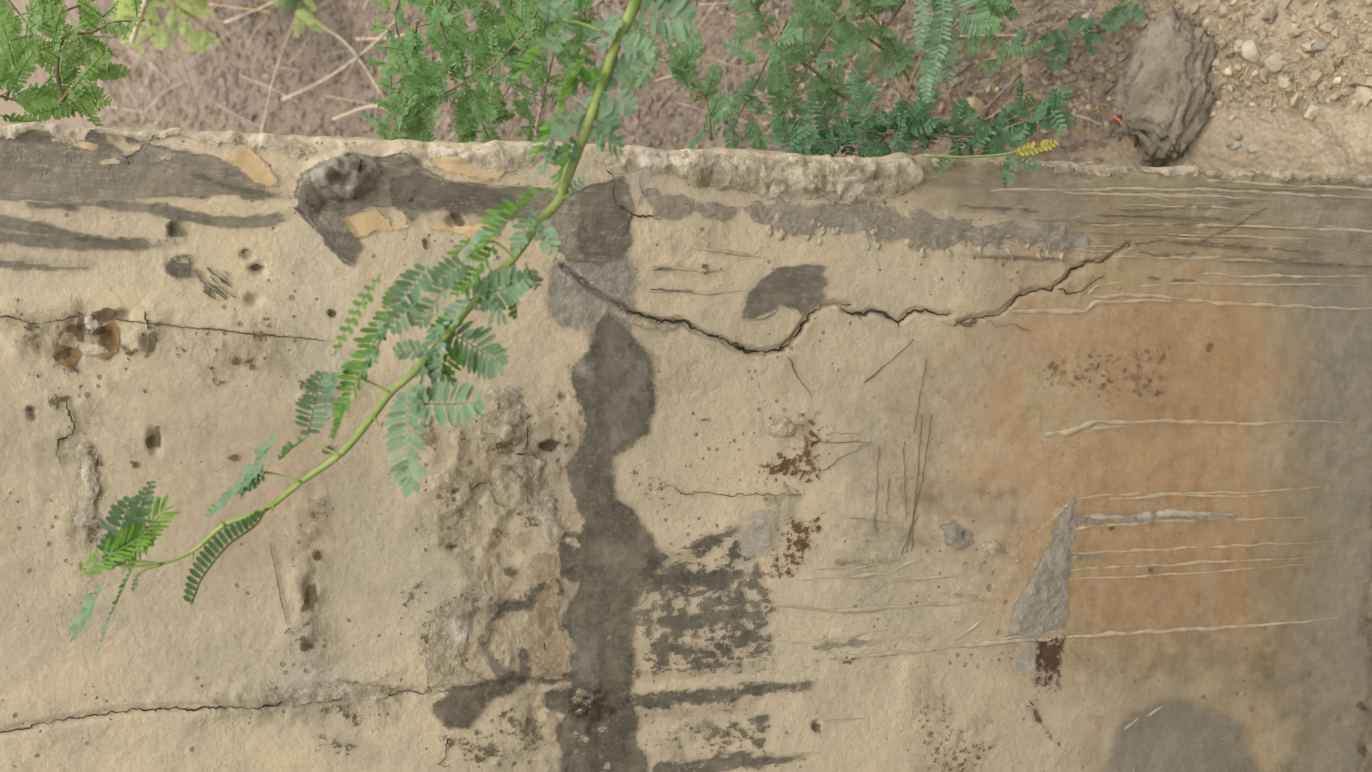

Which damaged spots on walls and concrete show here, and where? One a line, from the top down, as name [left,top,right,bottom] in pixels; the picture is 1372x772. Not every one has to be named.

water stain [0,129,635,300]
crack [0,313,77,324]
crack [115,311,323,341]
crack [562,207,1267,398]
crack [655,485,802,497]
corrosion [761,413,821,492]
crack [802,432,870,470]
water stain [641,159,1372,772]
water stain [432,313,811,772]
corrosion [764,498,823,578]
crack [0,652,449,733]
corrosion [1019,638,1064,739]